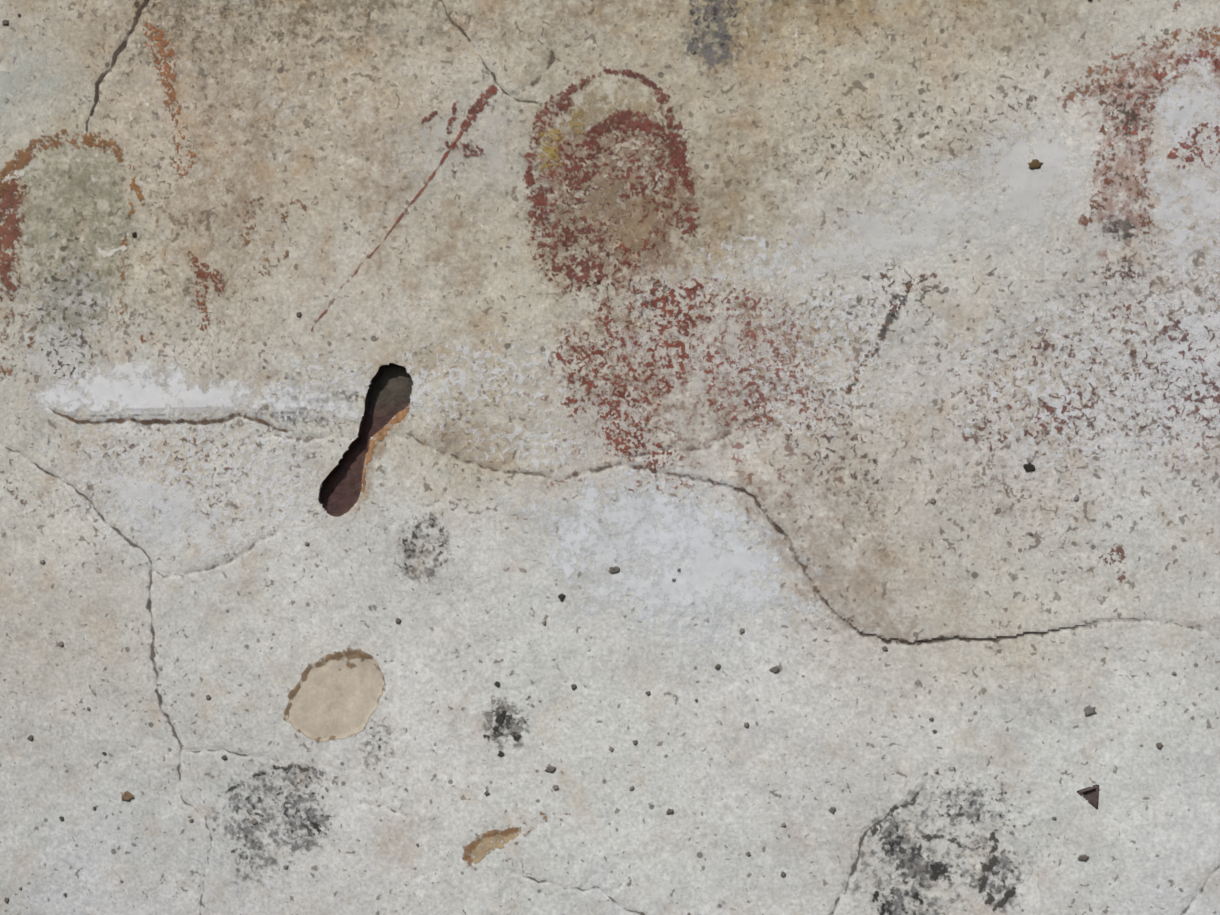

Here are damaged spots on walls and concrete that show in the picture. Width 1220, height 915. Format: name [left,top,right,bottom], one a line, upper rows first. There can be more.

crack [86,0,148,132]
damp [687,0,737,79]
spalling [318,363,413,517]
damp [402,514,446,579]
crack [452,418,833,612]
crack [6,447,273,915]
spalling [283,648,385,743]
crack [858,618,1193,645]
damp [214,763,335,879]
spalling [462,827,530,869]
damp [861,767,1021,915]